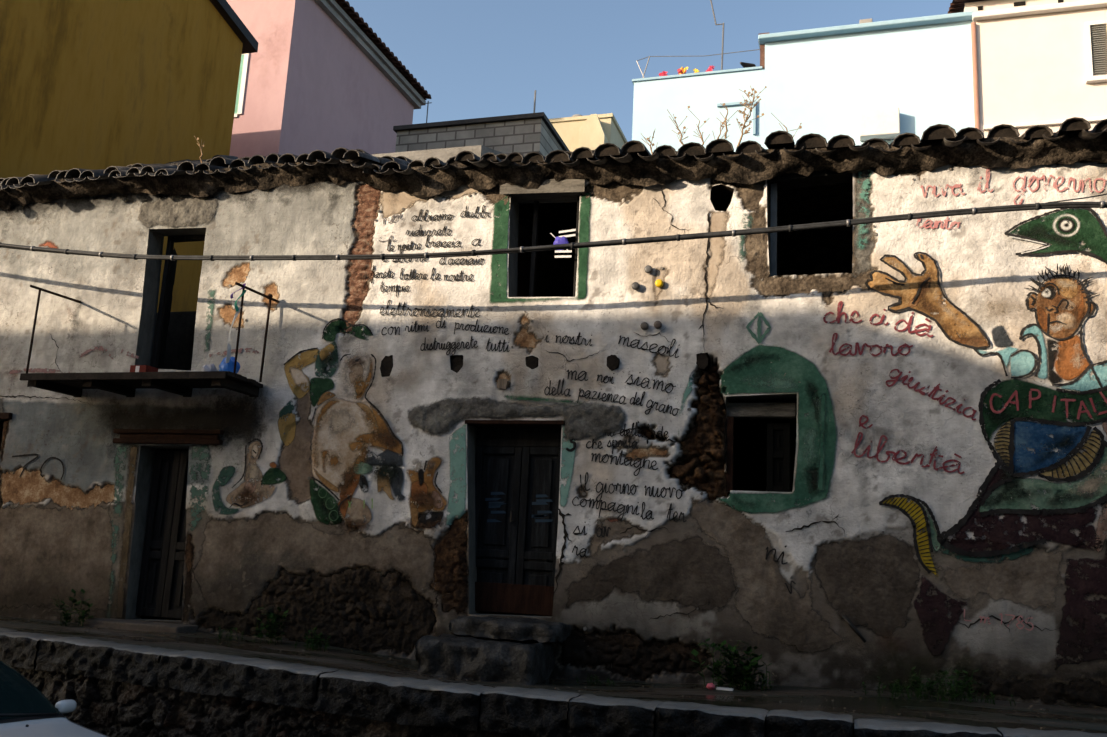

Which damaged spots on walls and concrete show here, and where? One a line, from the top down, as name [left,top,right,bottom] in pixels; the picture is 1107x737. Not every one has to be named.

flaking render [219,305,247,330]
flaking render [223,263,250,287]
flaking render [263,283,279,310]
flaking render [341,183,483,333]
crack [653,185,724,349]
spalling [617,363,729,501]
flaking render [0,467,115,510]